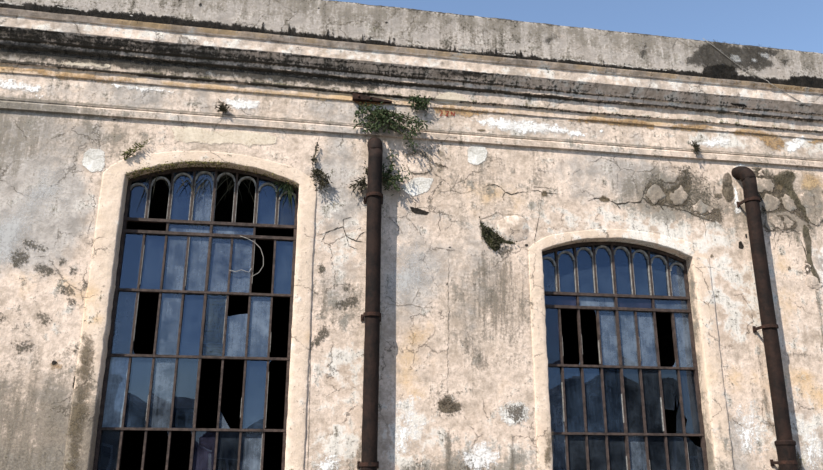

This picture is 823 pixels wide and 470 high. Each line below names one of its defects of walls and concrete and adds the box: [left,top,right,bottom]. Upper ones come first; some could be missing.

leakage [0,0,823,93]
crack [320,217,365,249]
crack [433,175,556,240]
flaking render [642,164,725,226]
flaking render [752,163,823,233]
leakage [774,170,820,283]
leakage [392,397,425,453]
flaking render [433,391,462,419]
leakage [455,441,500,470]